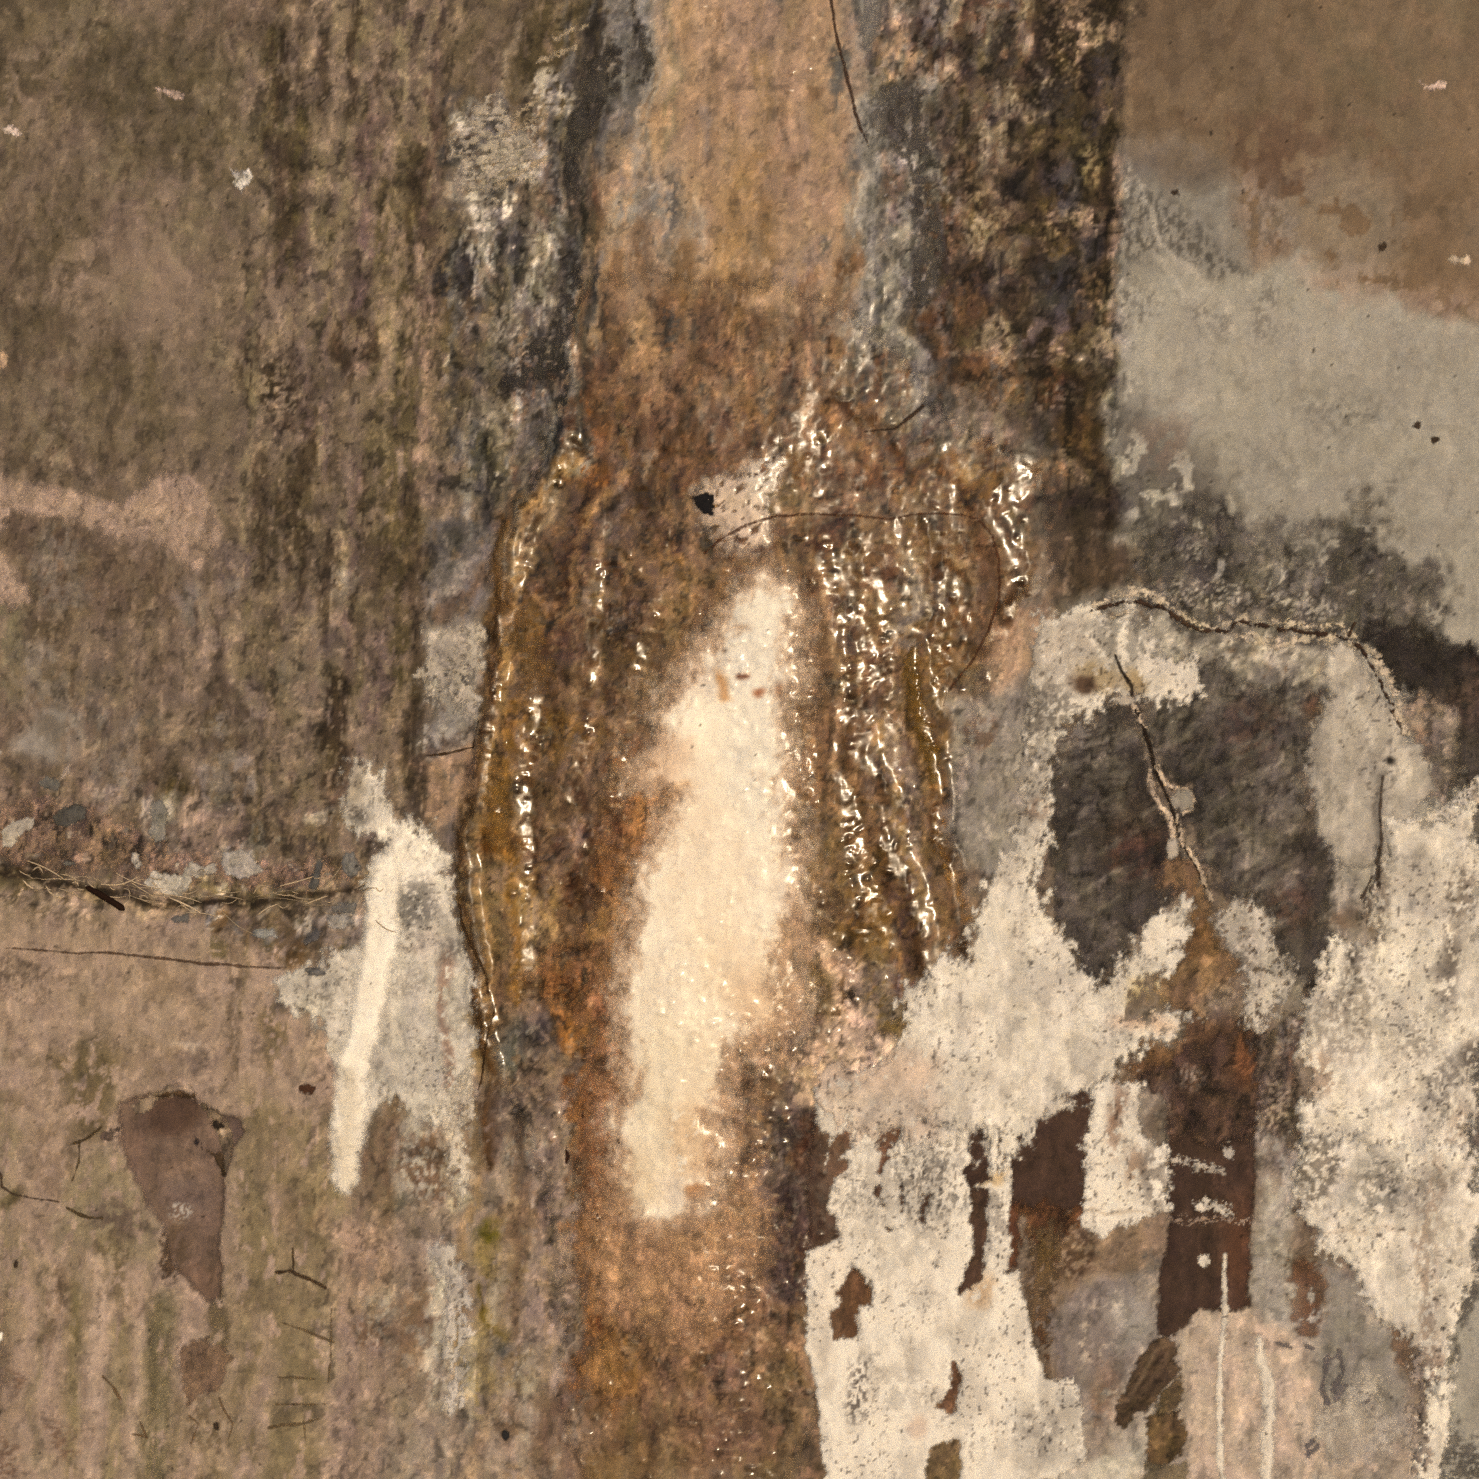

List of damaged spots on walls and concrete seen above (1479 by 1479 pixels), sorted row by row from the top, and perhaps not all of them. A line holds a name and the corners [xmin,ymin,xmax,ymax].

corrosion [902,647,939,785]
corrosion [933,820,968,919]
crack [1115,654,1214,902]
crack [1091,586,1410,736]
crack [1360,776,1479,899]
efflorescence [273,757,479,1205]
spalling [100,1083,244,1302]
corrosion [524,782,674,1413]
peeling [1167,1140,1234,1176]
peeling [1167,1197,1251,1227]
efflorescence [428,1236,476,1417]
peeling [1115,1336,1188,1466]